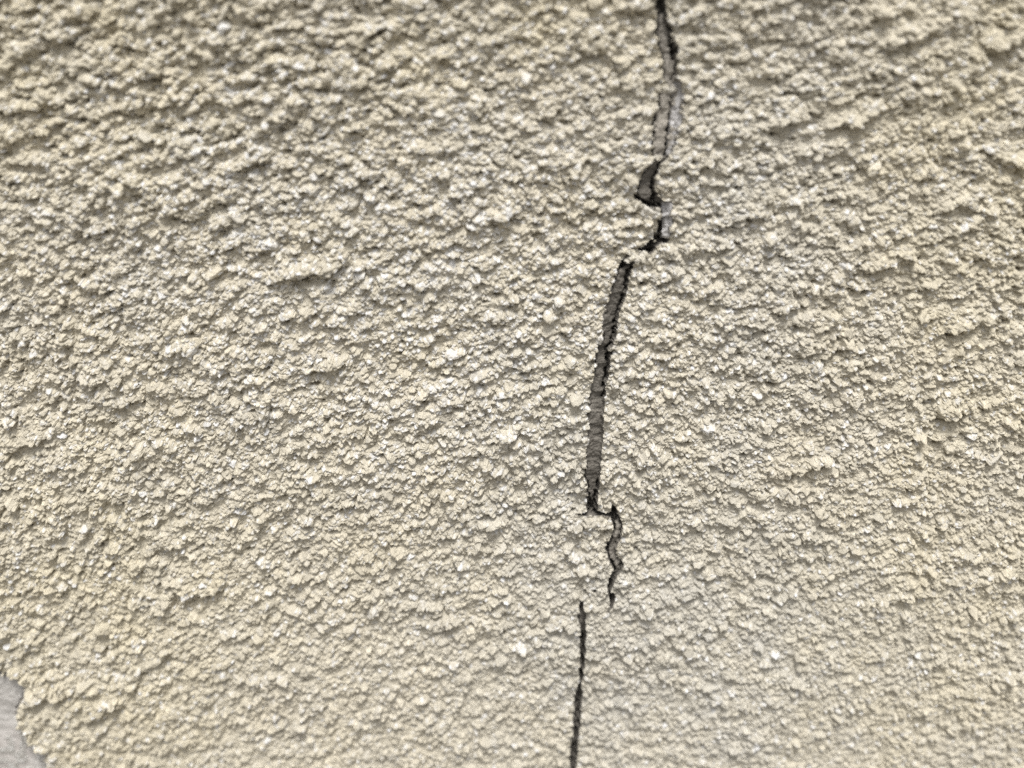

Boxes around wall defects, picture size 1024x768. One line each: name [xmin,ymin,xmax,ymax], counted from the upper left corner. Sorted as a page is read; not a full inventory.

spalling [0,671,47,768]
crack [569,0,686,768]